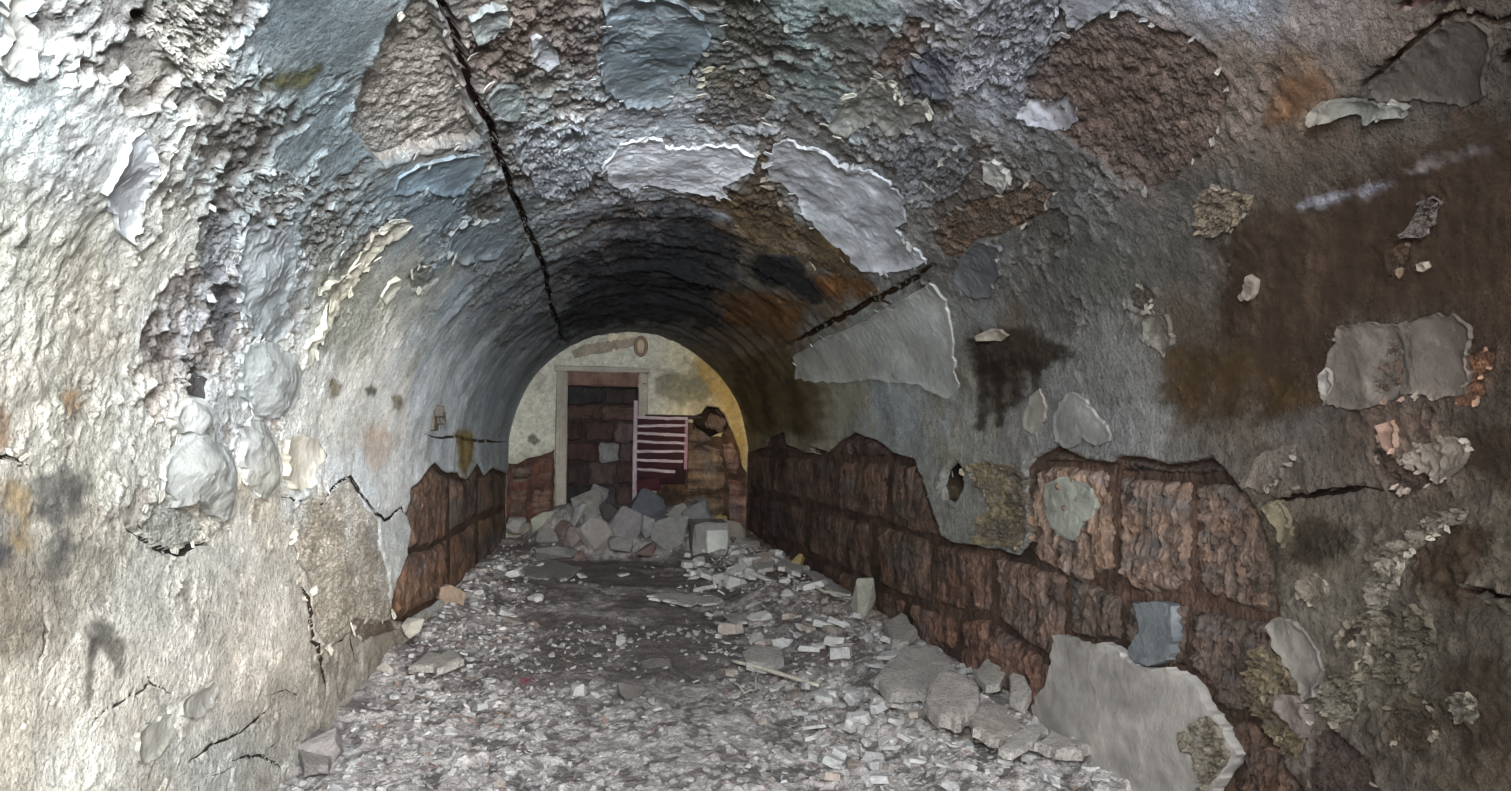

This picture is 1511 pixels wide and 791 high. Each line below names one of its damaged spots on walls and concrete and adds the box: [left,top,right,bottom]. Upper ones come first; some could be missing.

flaking render [0,0,45,82]
crack [1363,4,1511,89]
flaking render [351,0,612,201]
flaking render [933,0,1229,198]
crack [436,0,561,339]
crack [791,265,932,345]
damp [967,330,1068,430]
crack [0,448,30,466]
damp [38,471,82,573]
flaking render [281,435,555,656]
flaking render [657,422,1380,791]
damp [86,622,124,707]